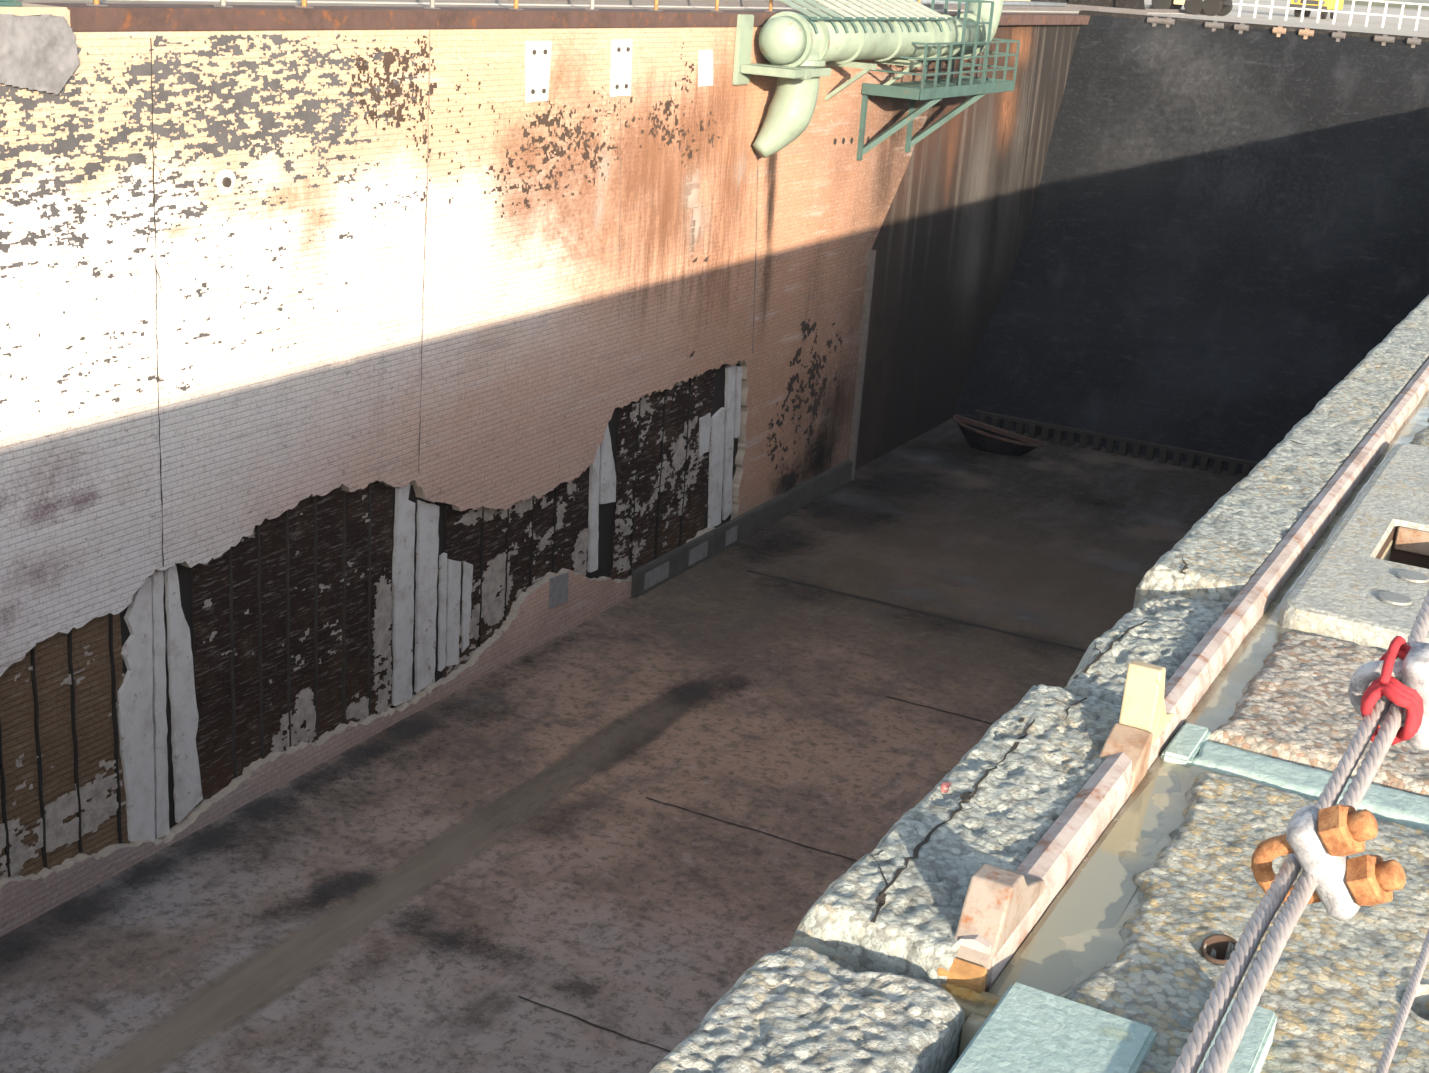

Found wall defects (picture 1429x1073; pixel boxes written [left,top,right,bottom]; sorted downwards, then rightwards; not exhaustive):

peeling [0,34,720,350]
damp [685,175,705,251]
damp [768,153,777,228]
peeling [56,319,193,414]
peeling [762,319,842,473]
spalling [0,360,748,889]
crack [646,570,1147,923]